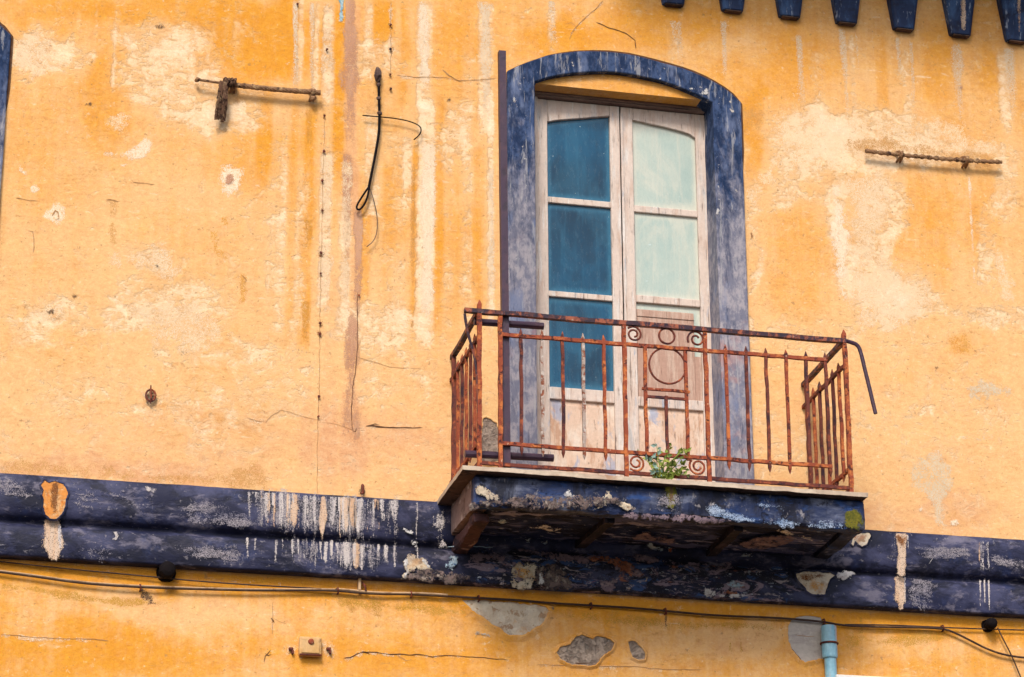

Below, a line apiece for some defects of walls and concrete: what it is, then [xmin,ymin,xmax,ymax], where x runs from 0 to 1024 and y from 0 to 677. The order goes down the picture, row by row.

leakage [292,0,364,453]
crack [249,116,423,493]
peeling [39,478,70,560]
leakage [1,457,398,570]
spalling [468,485,843,557]
flaking render [401,528,572,642]
flaking render [589,532,683,593]
leakage [894,533,909,610]
crack [345,651,506,661]
flaking render [553,631,648,670]
spalling [783,611,827,667]